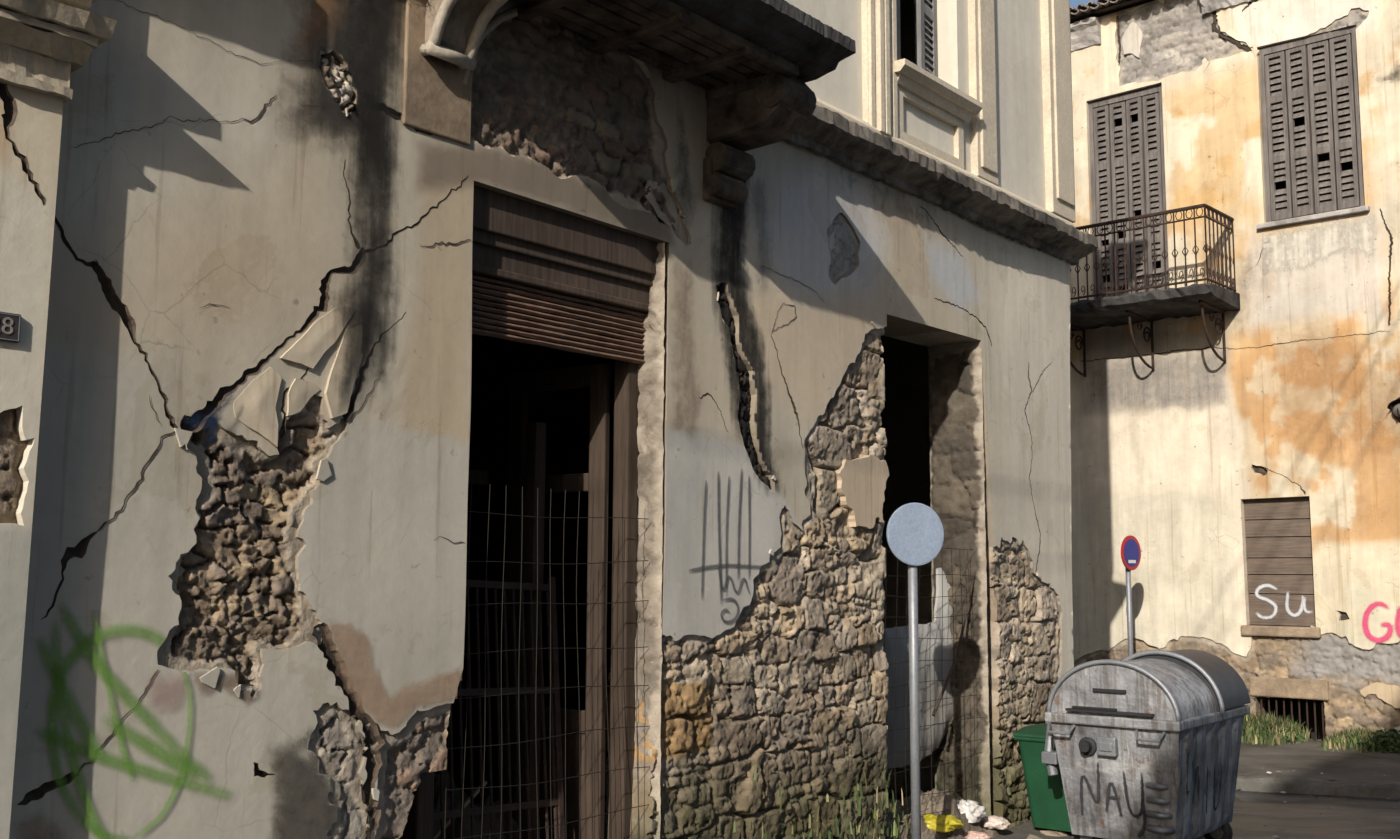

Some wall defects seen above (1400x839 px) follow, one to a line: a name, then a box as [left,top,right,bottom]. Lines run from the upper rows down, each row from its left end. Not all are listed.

crack [71,0,430,148]
water stain [310,0,400,391]
flaking render [463,7,681,230]
flaking render [1116,0,1260,86]
flaking render [0,408,28,524]
crack [0,83,470,619]
flaking render [157,395,460,839]
water stain [714,201,777,488]
flaking render [716,285,776,489]
flaking render [630,321,889,839]
crack [763,266,821,447]
flaking render [986,538,1400,831]